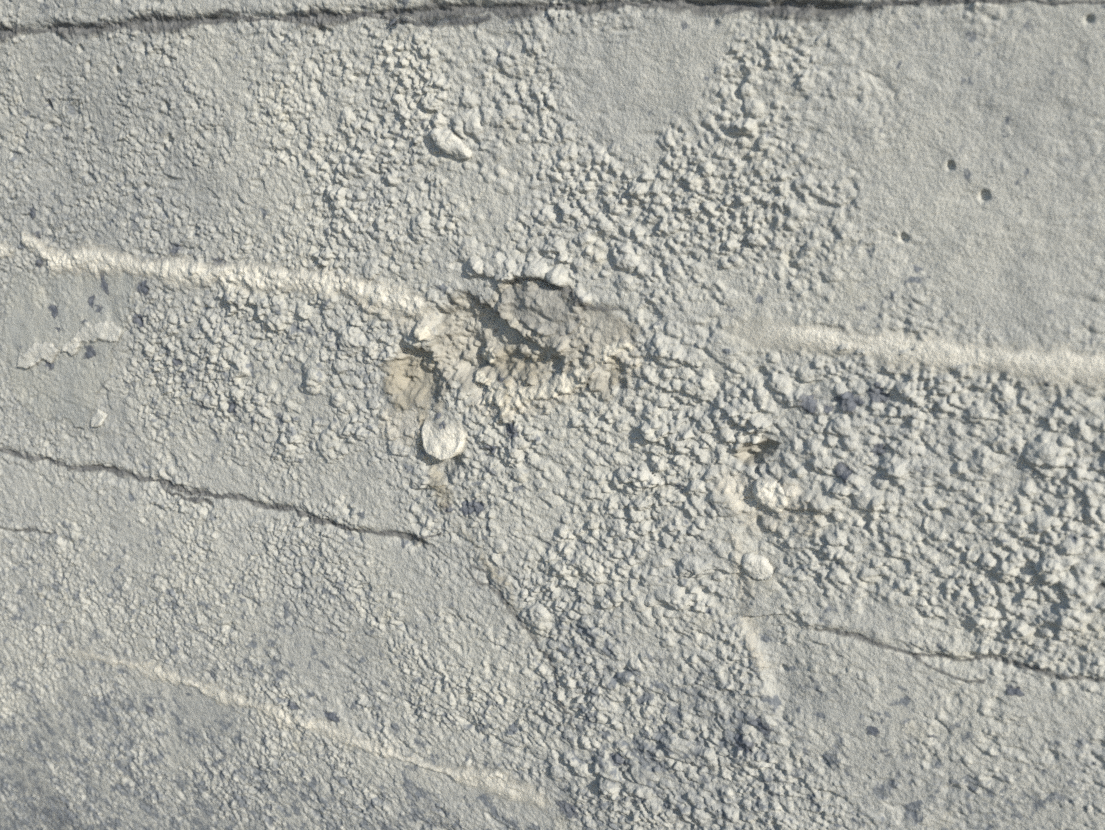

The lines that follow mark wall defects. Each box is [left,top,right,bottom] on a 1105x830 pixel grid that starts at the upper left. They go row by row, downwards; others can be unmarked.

crack [0,0,1105,42]
peeling [2,270,137,431]
spalling [382,278,636,416]
crack [0,448,442,544]
crack [817,629,1105,683]